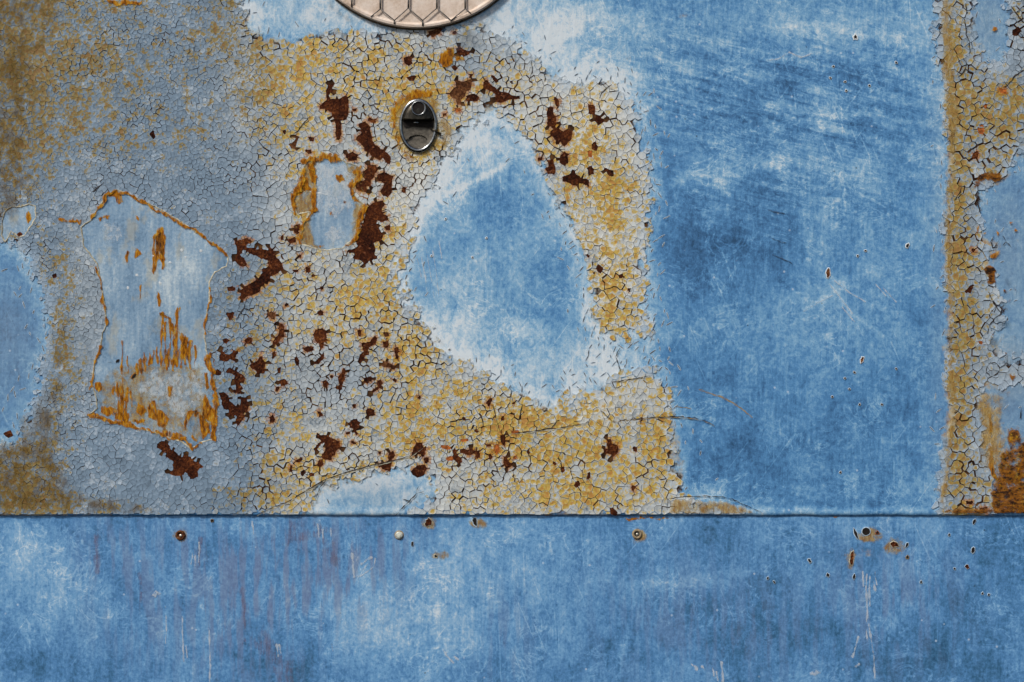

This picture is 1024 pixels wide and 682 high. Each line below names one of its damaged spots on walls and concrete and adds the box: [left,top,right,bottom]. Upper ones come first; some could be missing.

rust [320,28,520,265]
rust [538,97,614,187]
peeling [58,189,229,451]
rust [216,303,289,426]
rust [227,224,324,300]
peeling [290,152,370,268]
rust [357,329,400,392]
crack [0,0,762,516]
crack [928,0,1024,515]
rust [290,404,375,476]
rust [411,442,429,477]
rust [941,396,1024,513]